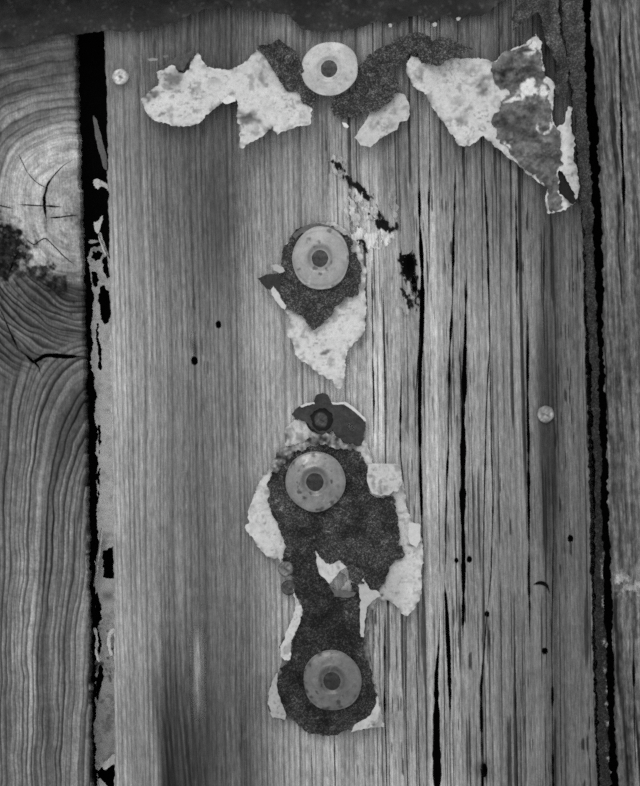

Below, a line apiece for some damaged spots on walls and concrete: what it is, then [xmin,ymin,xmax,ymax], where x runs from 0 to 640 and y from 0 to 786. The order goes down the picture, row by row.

crack [0,156,76,270]
peeling [330,155,399,253]
crack [0,310,83,374]
crack [371,152,430,578]
crack [404,163,494,786]
crack [381,623,389,786]